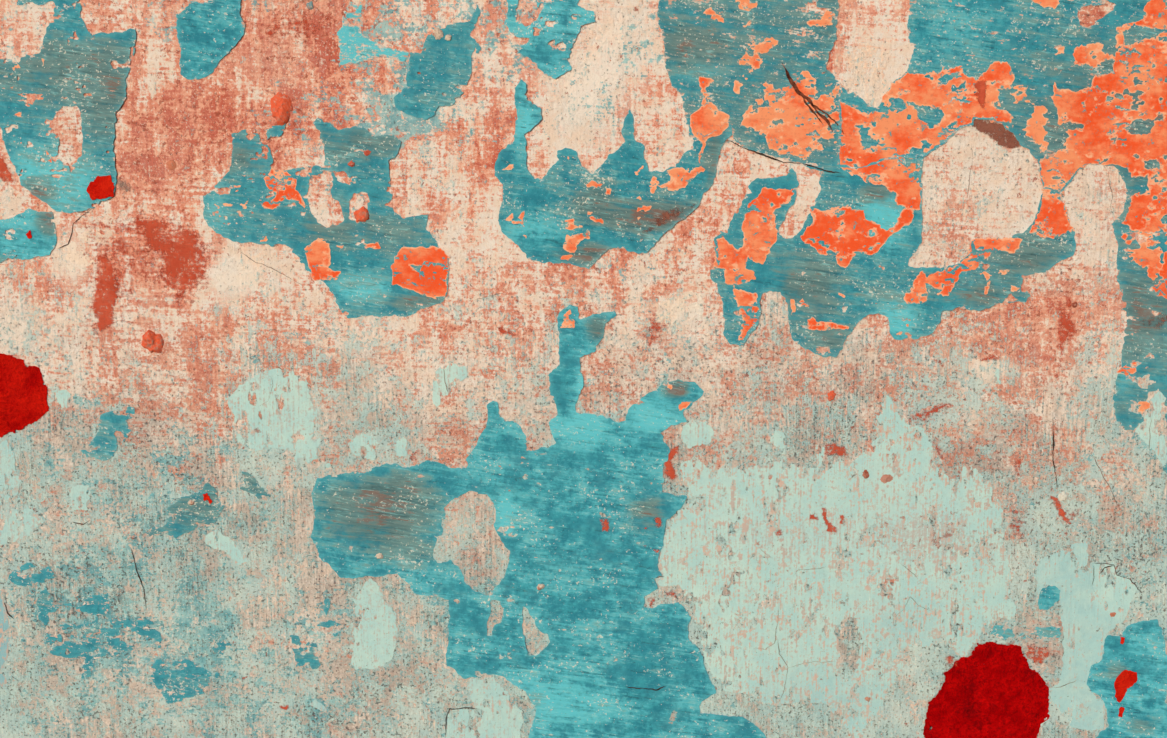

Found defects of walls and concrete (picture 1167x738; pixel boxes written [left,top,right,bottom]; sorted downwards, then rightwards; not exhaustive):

peeling [0,0,136,273]
peeling [203,118,450,319]
crack [782,63,844,134]
peeling [494,0,1167,473]
spalling [0,318,71,545]
peeling [69,485,91,511]
peeling [81,406,135,461]
peeling [225,305,1167,738]